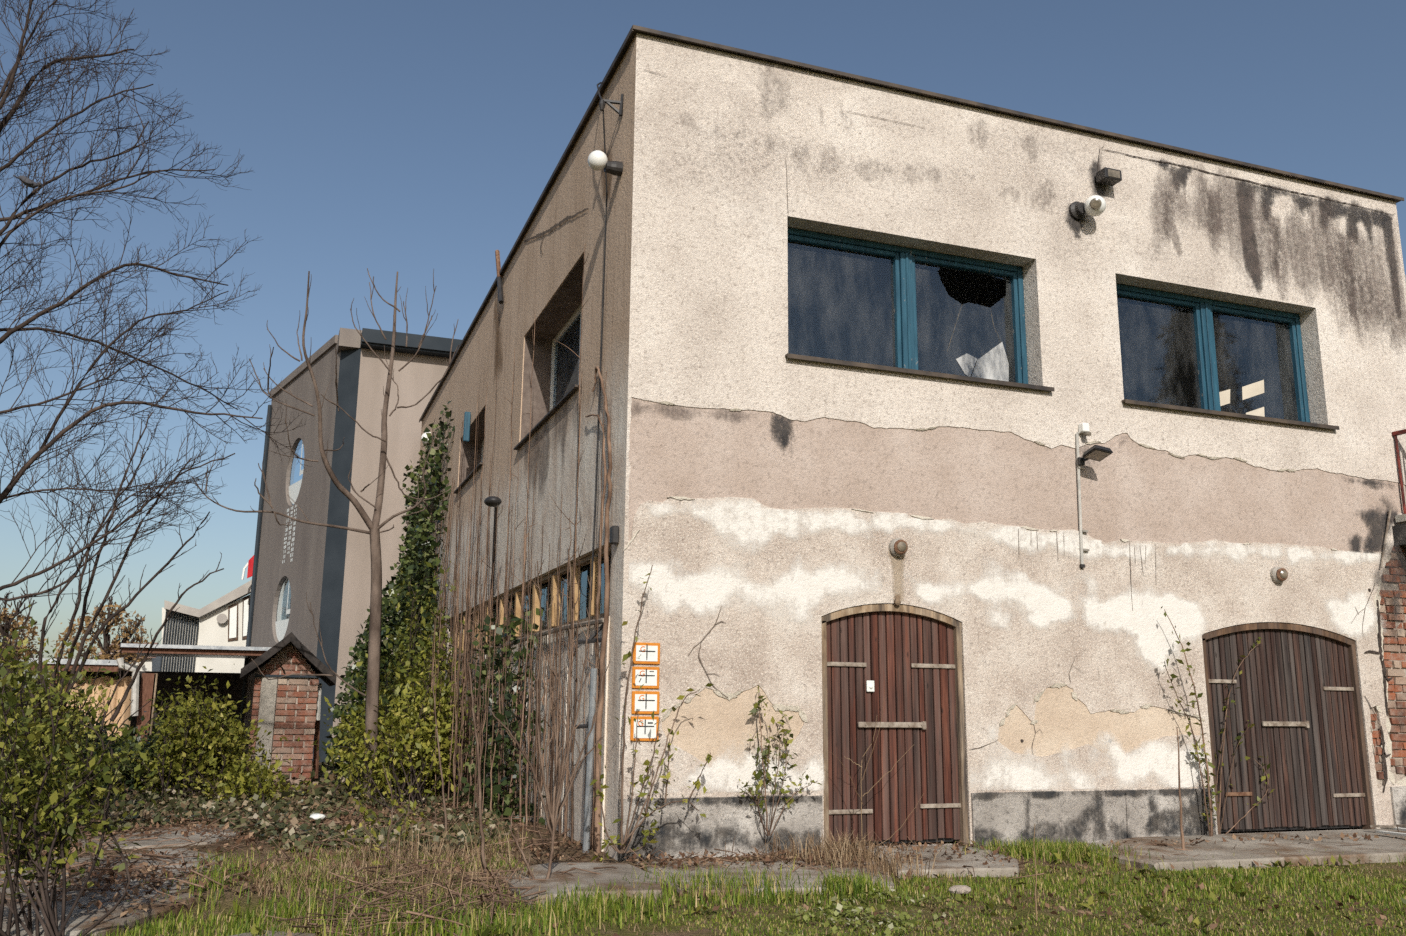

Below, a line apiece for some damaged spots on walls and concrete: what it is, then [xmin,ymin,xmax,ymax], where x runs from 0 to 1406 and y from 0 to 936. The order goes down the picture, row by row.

leakage [1155,160,1406,337]
leakage [771,415,792,448]
leakage [648,479,1398,565]
leakage [629,561,879,621]
peeling [623,397,1406,787]
leakage [916,561,1206,671]
leakage [1326,592,1378,638]
crack [688,605,791,772]
leakage [975,828,999,847]
leakage [970,734,1216,844]